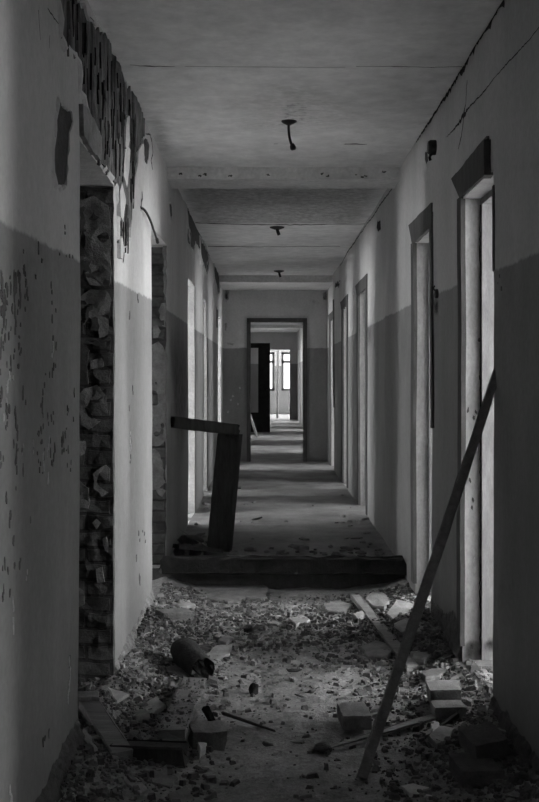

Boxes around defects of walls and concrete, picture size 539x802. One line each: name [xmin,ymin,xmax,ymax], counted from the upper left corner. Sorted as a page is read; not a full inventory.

crack [136,62,221,70]
crack [416,0,539,149]
flaking render [0,0,155,684]
flaking render [138,246,167,565]